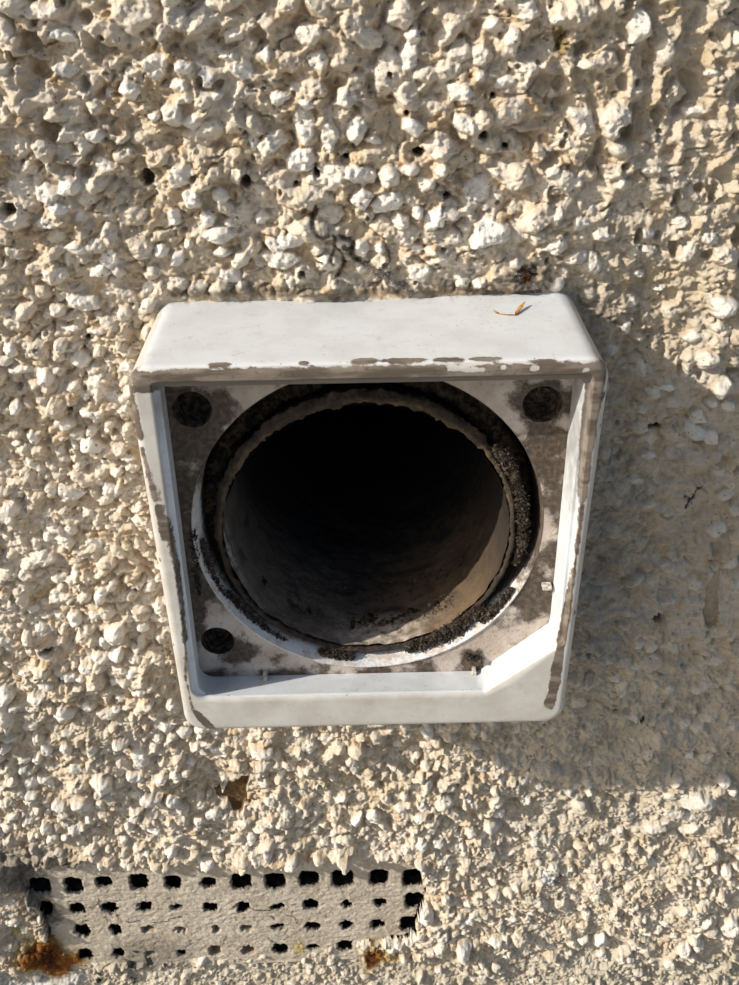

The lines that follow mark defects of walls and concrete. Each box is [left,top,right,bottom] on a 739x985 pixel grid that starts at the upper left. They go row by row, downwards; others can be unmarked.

spalling [215,776,251,813]
corrosion [9,934,85,977]
corrosion [363,946,396,971]